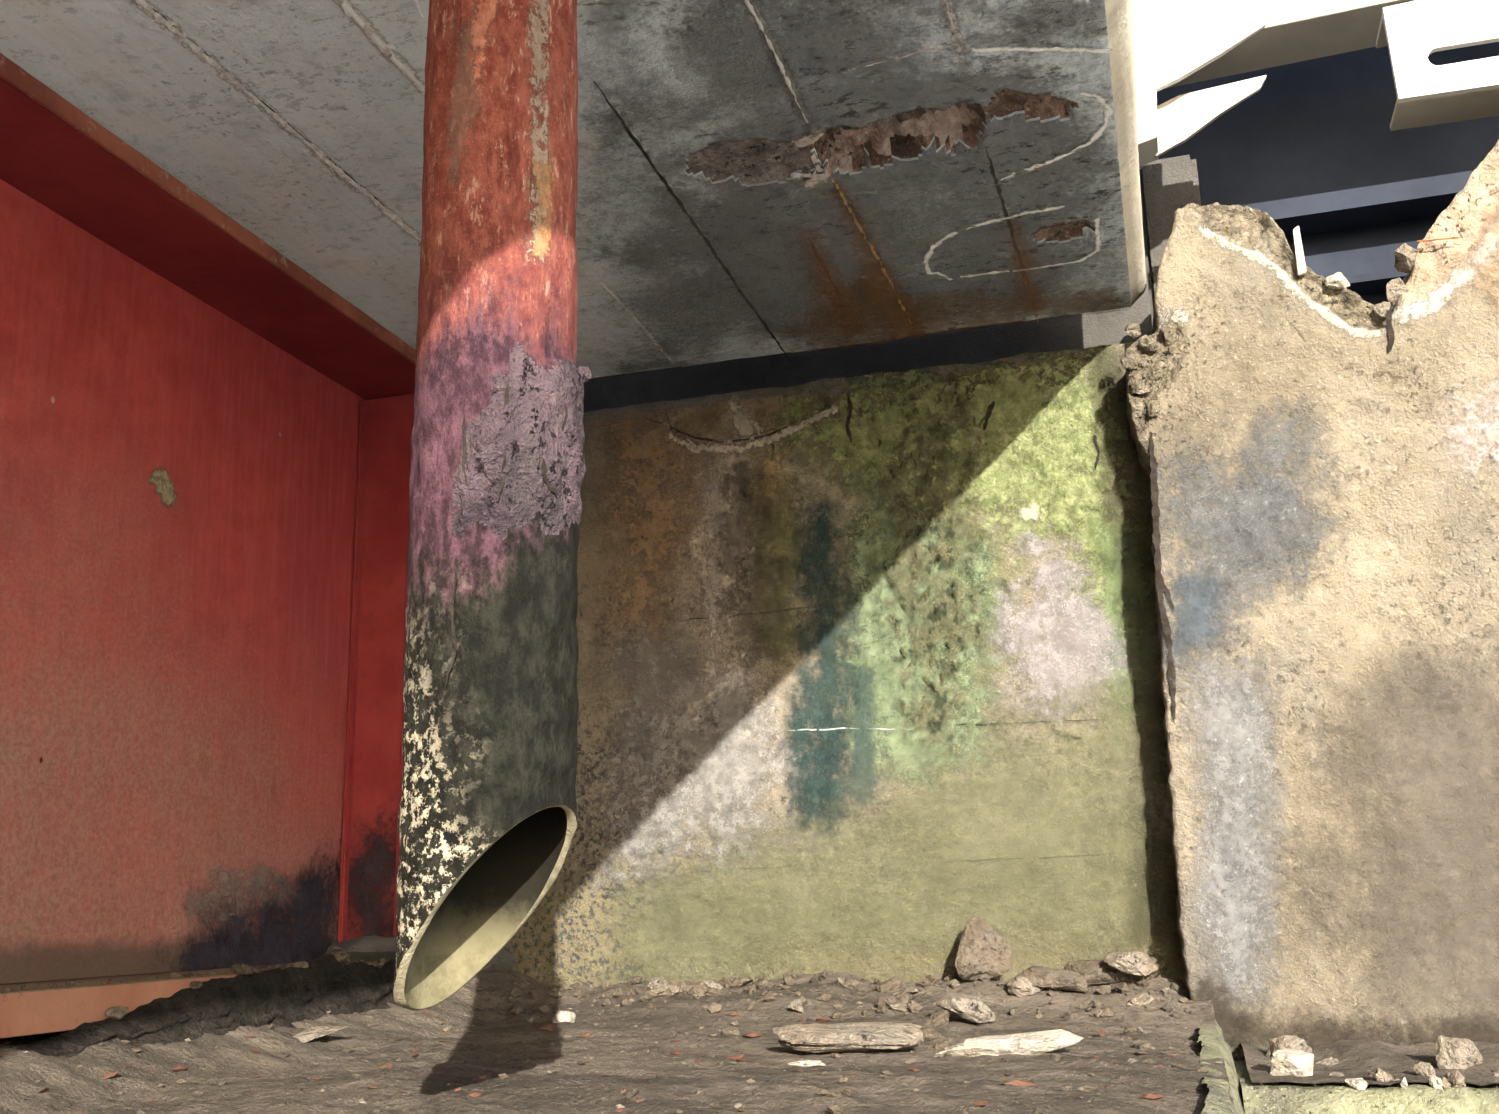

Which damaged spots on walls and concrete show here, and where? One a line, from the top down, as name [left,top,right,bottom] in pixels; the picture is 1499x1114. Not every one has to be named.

damp [133,0,425,246]
peeling [471,0,498,103]
peeling [527,0,553,262]
spalling [808,91,1079,173]
spalling [1188,140,1499,332]
peeling [149,469,177,506]
damp [589,398,1177,982]
damp [1157,407,1499,1051]